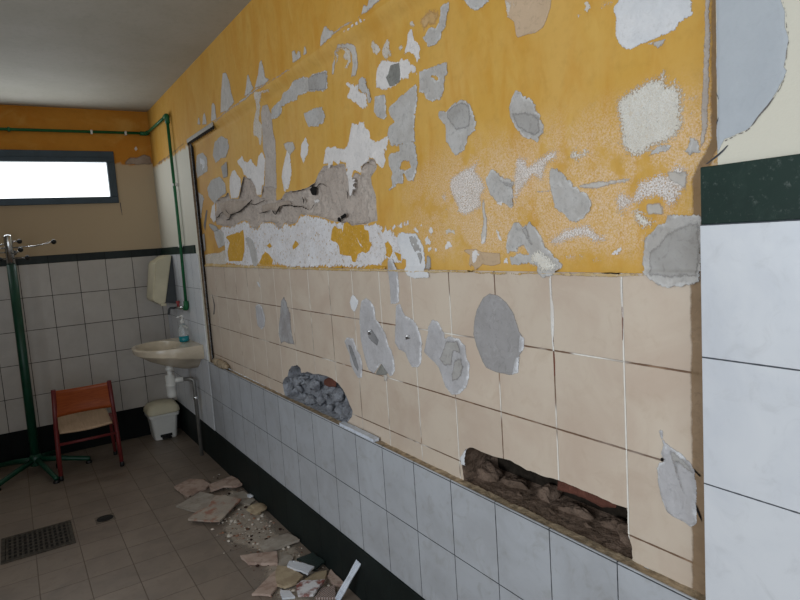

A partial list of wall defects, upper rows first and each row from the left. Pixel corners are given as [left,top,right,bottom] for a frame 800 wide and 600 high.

peeling [204,88,643,277]
spalling [283,365,353,422]
spalling [460,448,633,559]